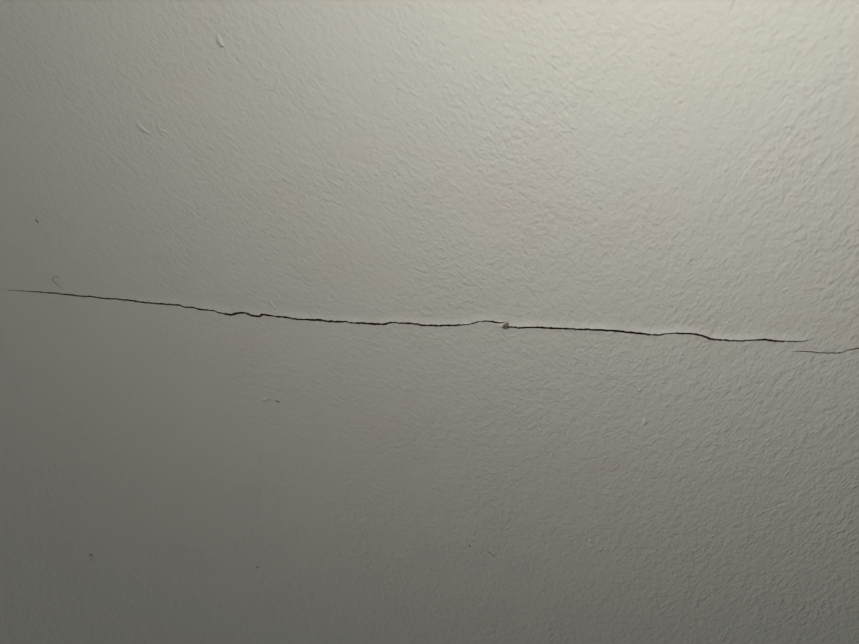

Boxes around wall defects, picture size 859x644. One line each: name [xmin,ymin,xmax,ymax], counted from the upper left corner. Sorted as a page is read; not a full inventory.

crack [4,286,859,358]